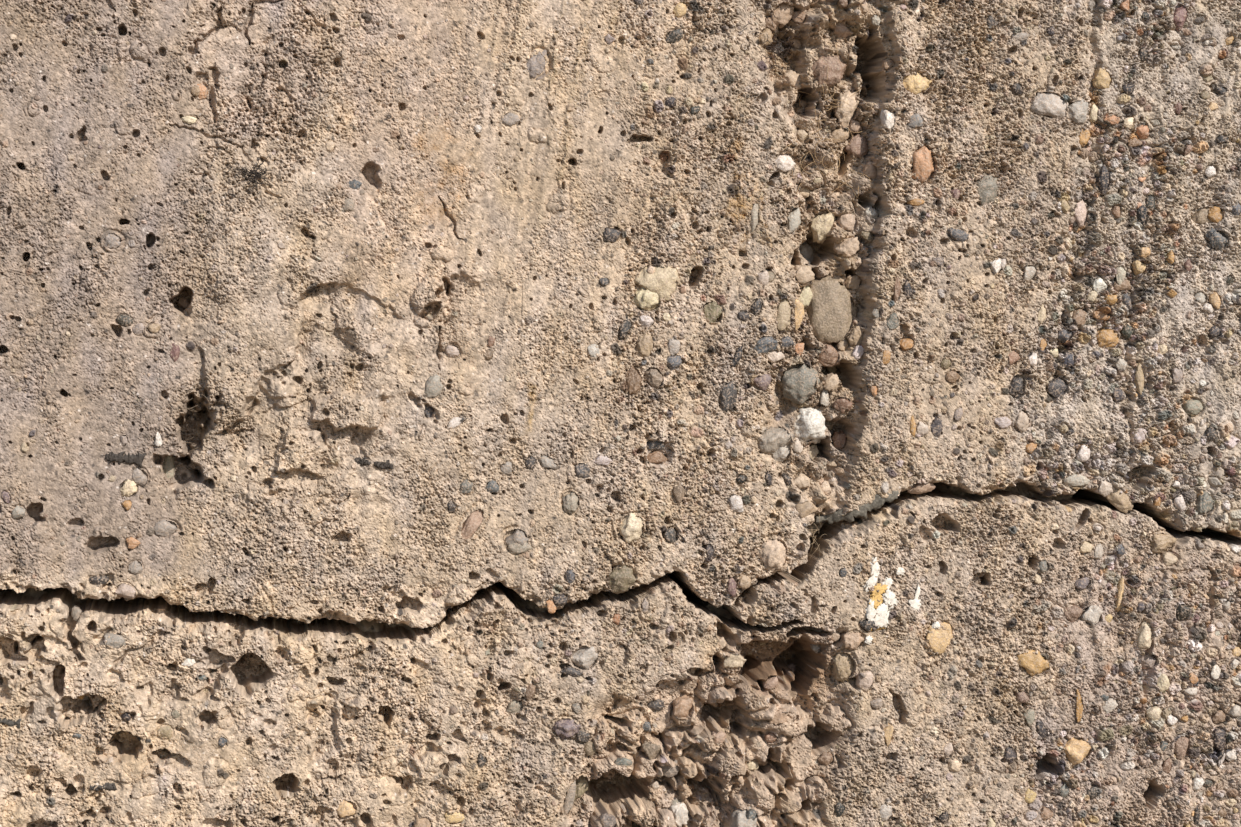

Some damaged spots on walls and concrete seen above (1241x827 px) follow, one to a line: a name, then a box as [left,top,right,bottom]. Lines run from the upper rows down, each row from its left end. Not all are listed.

crack [0,481,1241,670]
spalling [563,619,874,827]